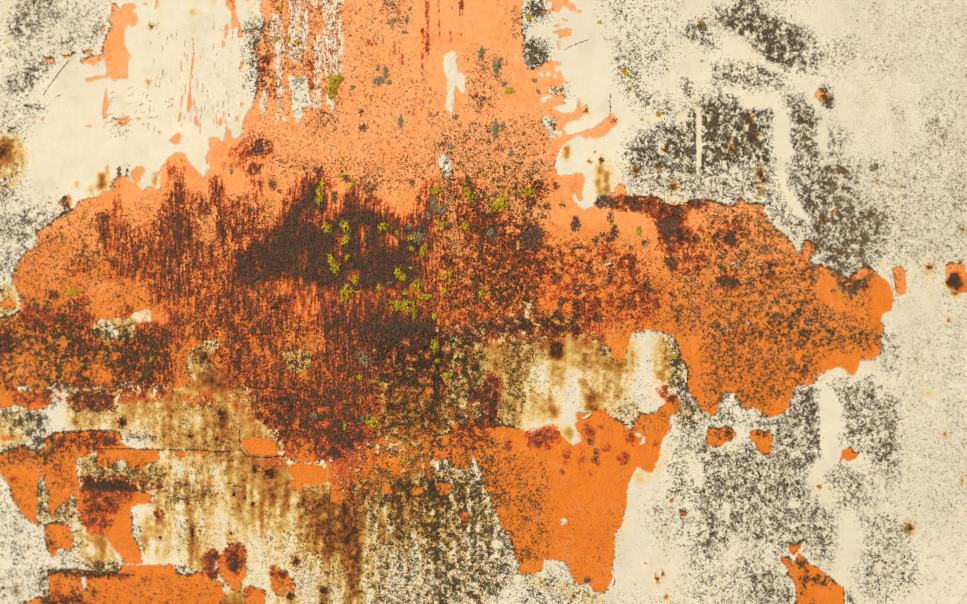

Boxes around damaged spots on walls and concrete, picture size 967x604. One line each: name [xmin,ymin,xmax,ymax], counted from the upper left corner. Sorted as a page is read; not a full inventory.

peeling [0,0,907,430]
corrosion [559,142,747,294]
corrosion [0,130,664,604]
corrosion [655,385,678,406]
water stain [919,325,967,393]
peeling [707,427,737,448]
peeling [750,429,773,455]
peeling [839,447,859,463]
peeling [0,431,295,604]
peeling [241,398,681,594]
corrosion [642,558,675,604]
peeling [782,543,847,604]